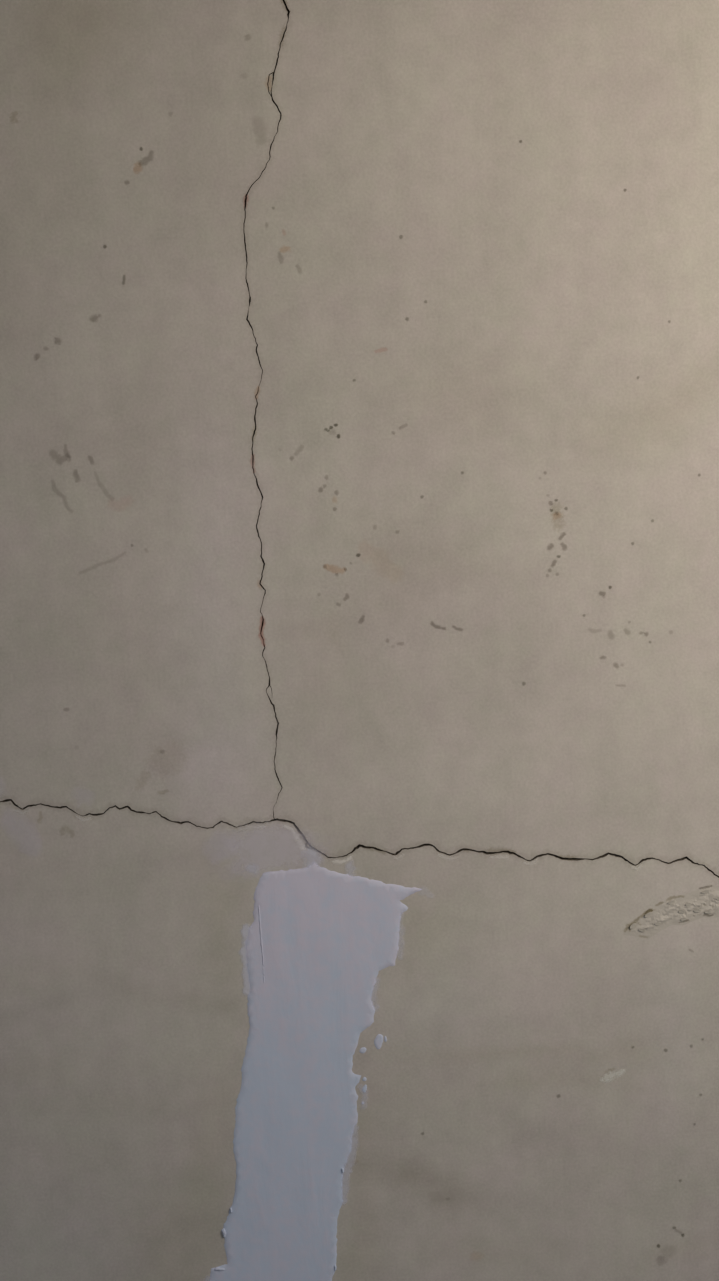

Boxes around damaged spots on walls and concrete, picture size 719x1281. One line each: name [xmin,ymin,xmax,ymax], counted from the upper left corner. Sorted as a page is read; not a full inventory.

crack [0,0,719,878]
flaking render [622,885,719,938]